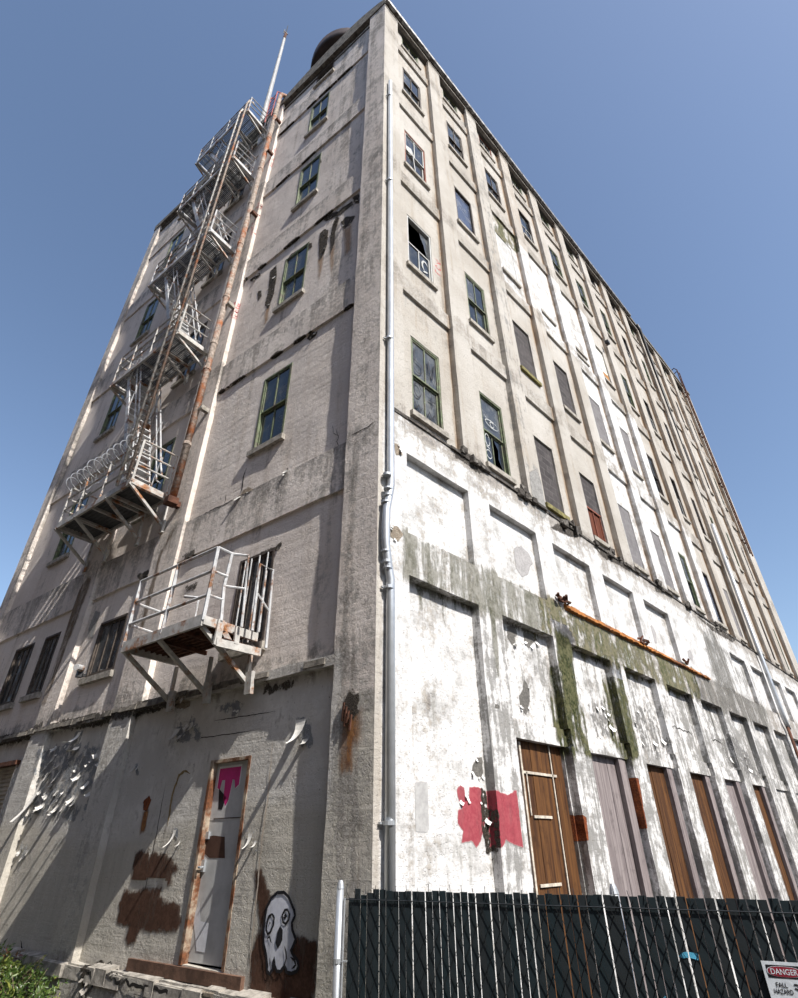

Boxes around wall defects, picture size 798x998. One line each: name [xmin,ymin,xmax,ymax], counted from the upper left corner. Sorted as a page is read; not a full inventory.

damp [418,573,431,610]
damp [489,599,499,676]
corrosion [341,689,360,769]
peeling [10,730,101,824]